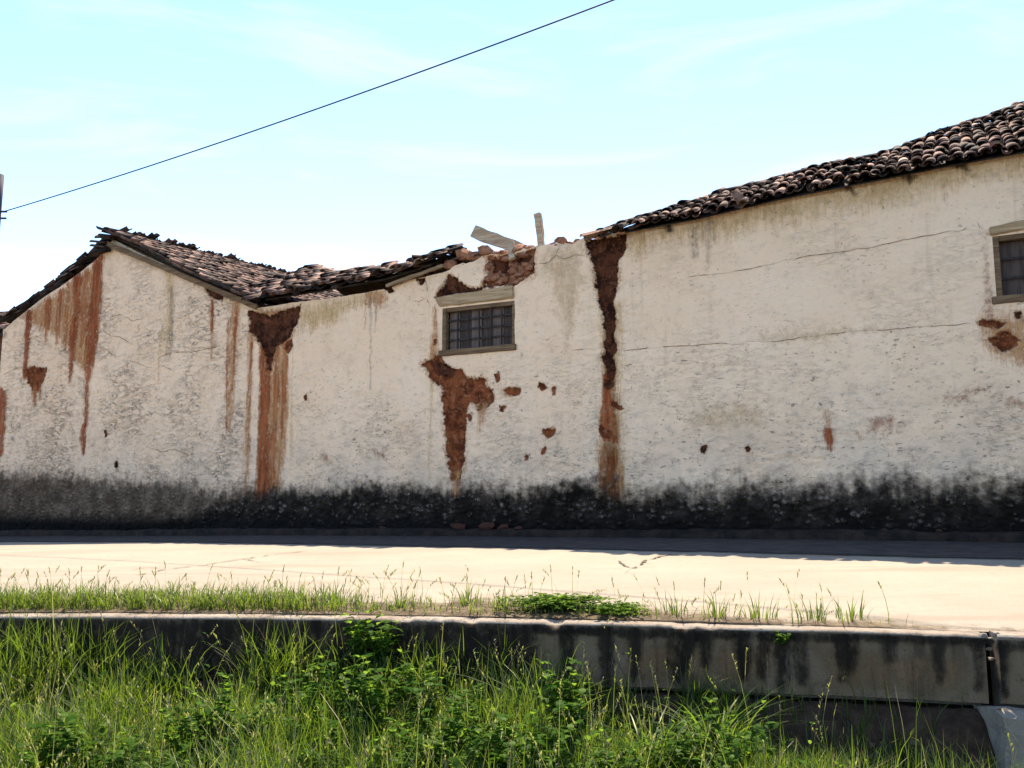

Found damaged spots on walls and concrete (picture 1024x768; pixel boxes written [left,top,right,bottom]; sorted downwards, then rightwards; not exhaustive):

spalling [412,245,536,298]
rust [22,254,103,455]
spalling [248,304,301,371]
spalling [585,232,627,381]
spalling [979,311,1022,352]
rust [225,302,292,497]
spalling [421,355,521,494]
spalling [524,426,555,461]
water stain [0,471,1024,532]